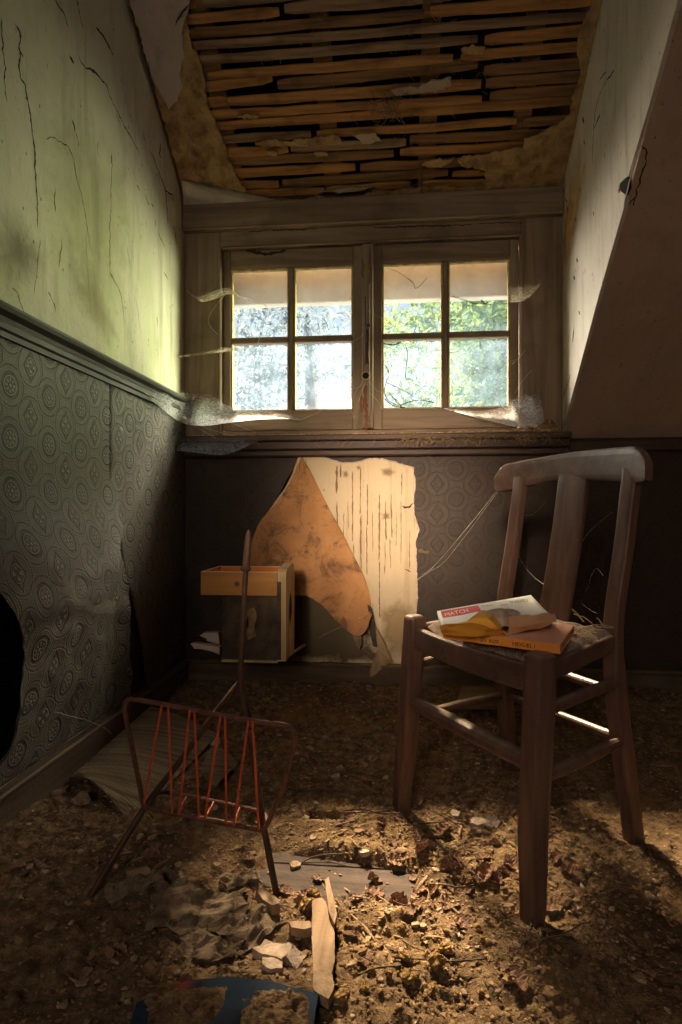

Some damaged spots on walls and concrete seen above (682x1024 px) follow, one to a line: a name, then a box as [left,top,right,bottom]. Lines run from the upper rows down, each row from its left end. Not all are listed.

crack [1,0,176,326]
flaking render [129,0,602,205]
crack [629,145,648,206]